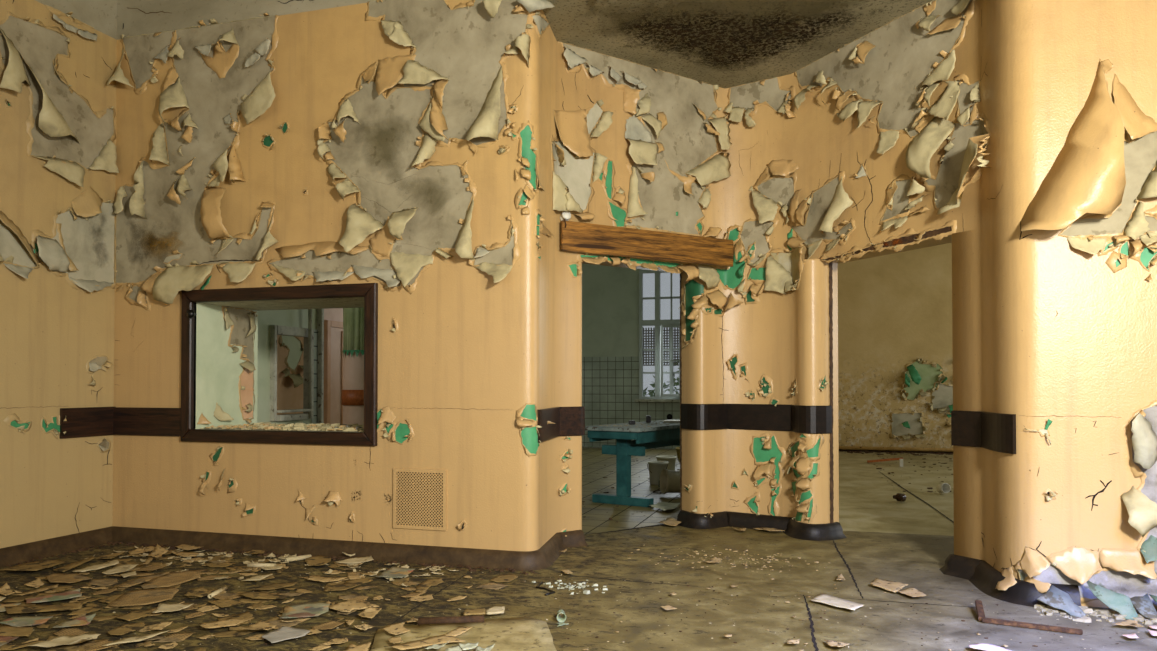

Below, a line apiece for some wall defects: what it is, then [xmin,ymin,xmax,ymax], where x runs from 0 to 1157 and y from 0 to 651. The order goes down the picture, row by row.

mould [611,0,850,67]
peeling [0,0,992,349]
peeling [1057,74,1157,280]
peeling [3,413,67,438]
peeling [377,406,415,445]
peeling [515,403,556,457]
peeling [726,354,797,406]
peeling [889,358,953,440]
peeling [200,446,256,517]
peeling [731,433,824,531]
peeling [995,400,1157,611]
crack [1085,452,1120,511]